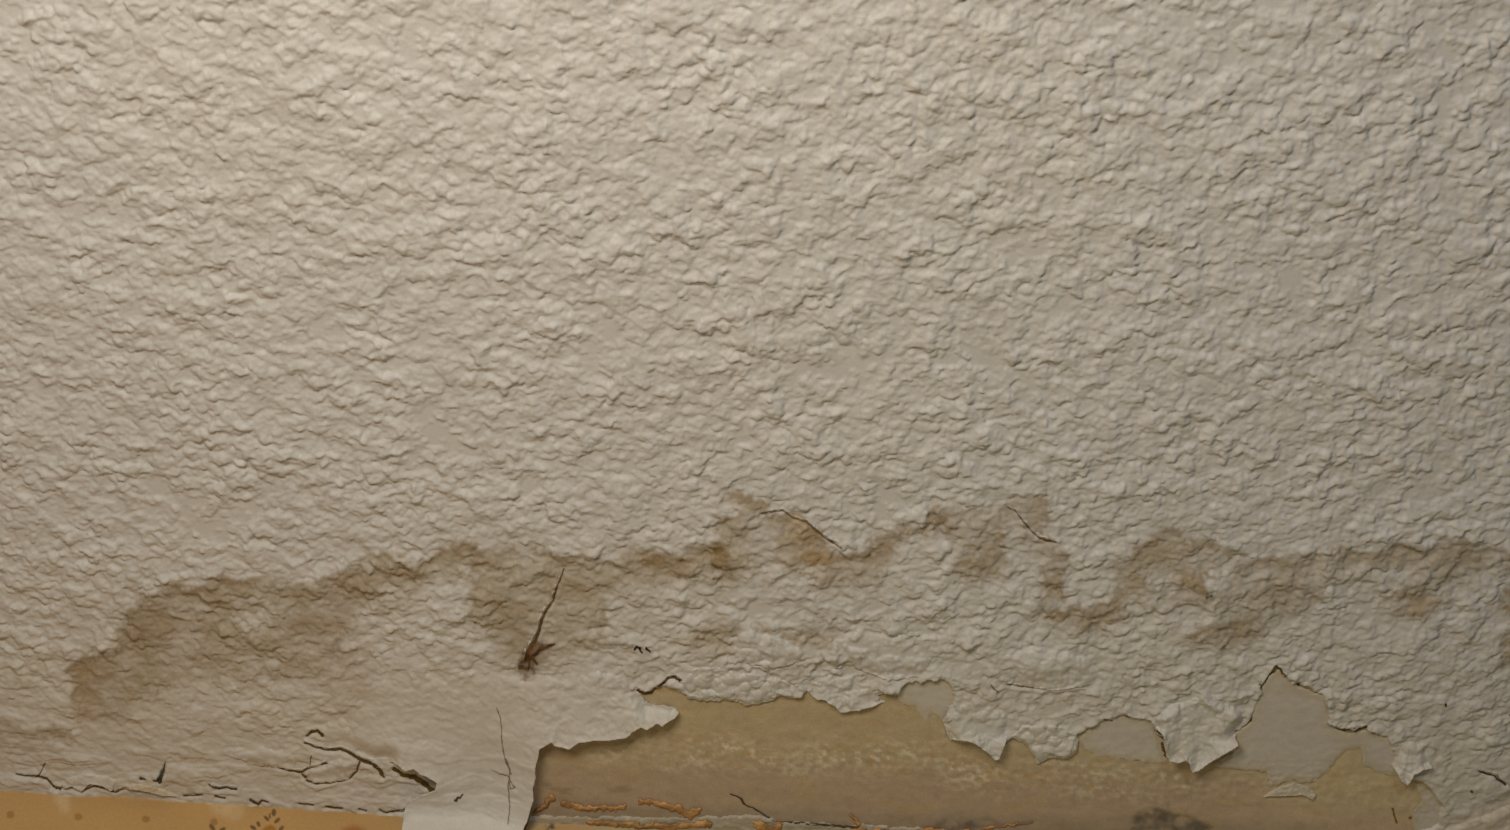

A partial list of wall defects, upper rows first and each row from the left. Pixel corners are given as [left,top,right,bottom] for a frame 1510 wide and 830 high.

crack [523,568,565,672]
crack [16,729,463,813]
crack [492,708,515,824]
peeling [334,666,1442,830]